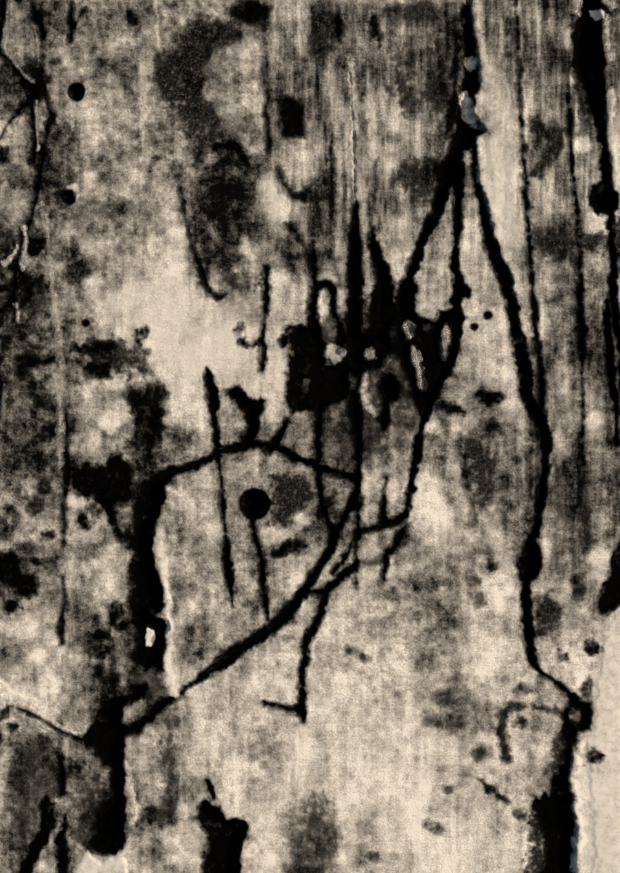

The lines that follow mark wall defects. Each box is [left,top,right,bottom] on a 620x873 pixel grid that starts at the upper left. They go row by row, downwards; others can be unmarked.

crack [66,3,87,43]
leakage [154,0,271,166]
crack [0,378,8,417]
crack [0,0,56,324]
crack [61,404,72,547]
leakage [70,326,170,544]
leakage [221,271,260,291]
leakage [321,311,347,363]
crack [125,0,577,736]
leakage [321,351,418,455]
crack [565,0,620,465]
crack [55,575,67,646]